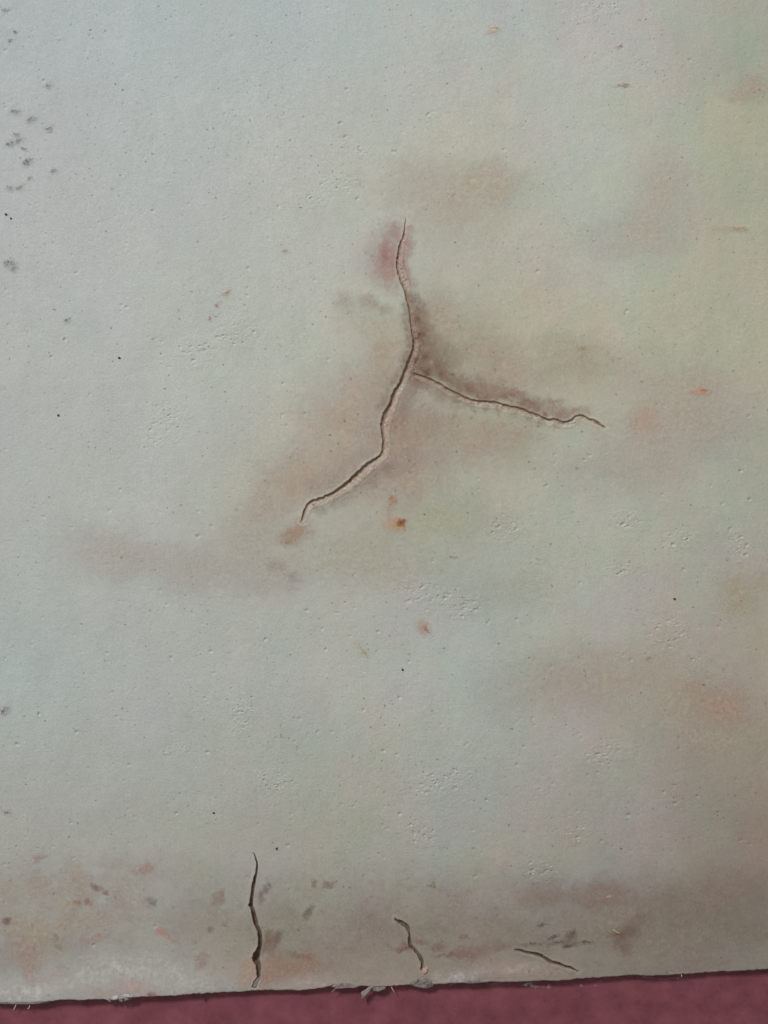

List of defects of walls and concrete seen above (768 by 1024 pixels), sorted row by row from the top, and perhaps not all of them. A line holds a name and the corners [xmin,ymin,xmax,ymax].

crack [299,216,607,525]
damp [366,295,577,483]
damp [0,869,211,1001]
crack [245,852,266,990]
crack [393,916,427,974]
damp [265,881,737,983]
crack [512,946,580,974]